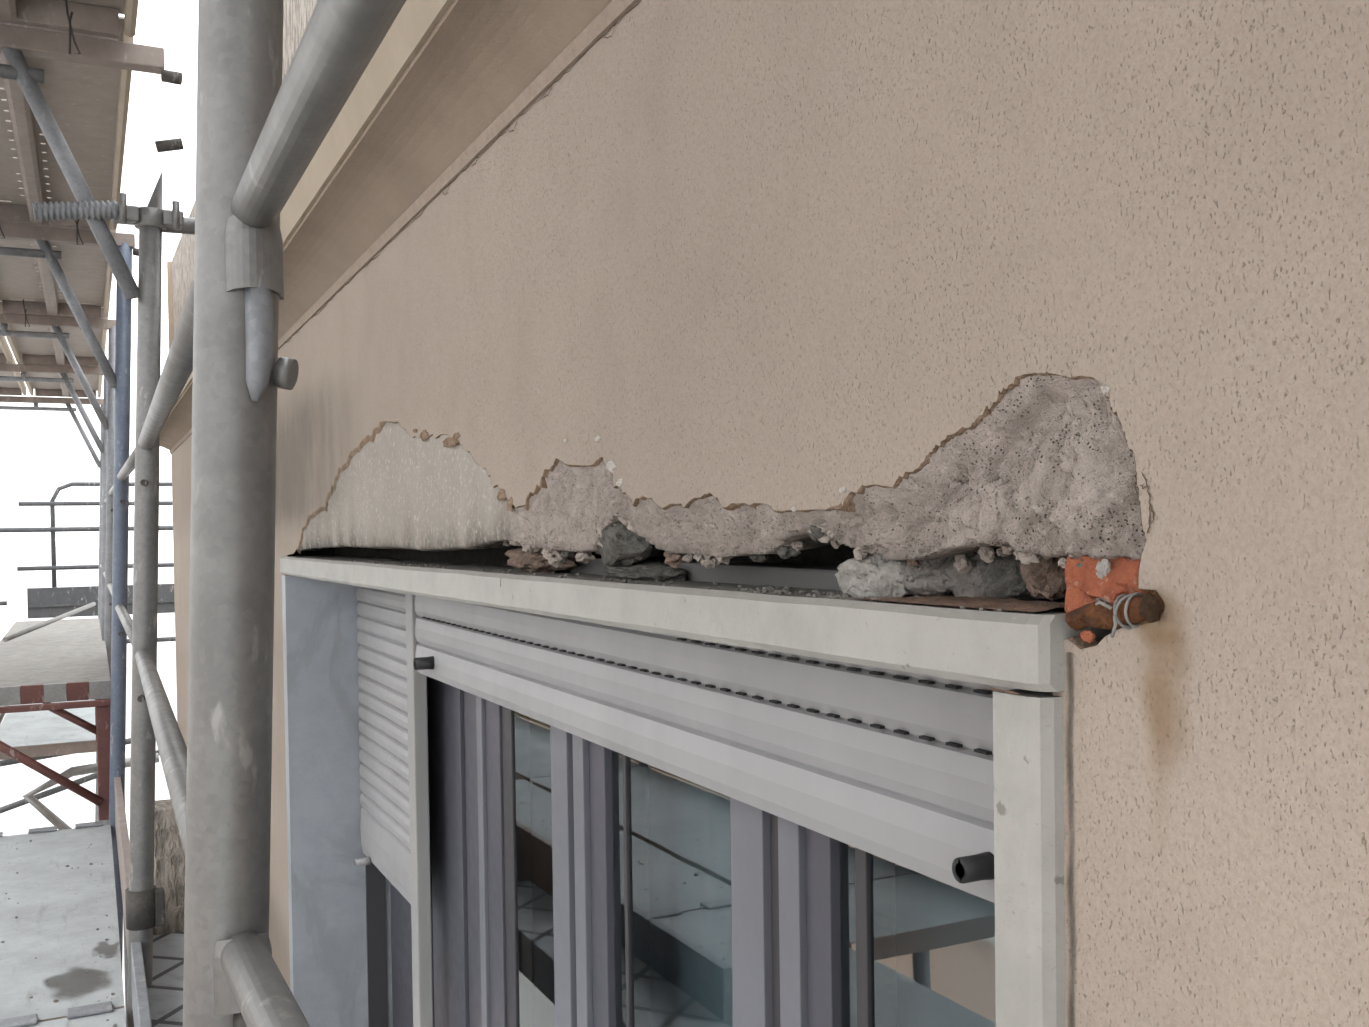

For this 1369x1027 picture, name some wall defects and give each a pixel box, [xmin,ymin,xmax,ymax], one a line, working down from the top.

spalling [297,372,1165,625]
spalling [1067,627,1122,649]
rust [1065,592,1165,638]